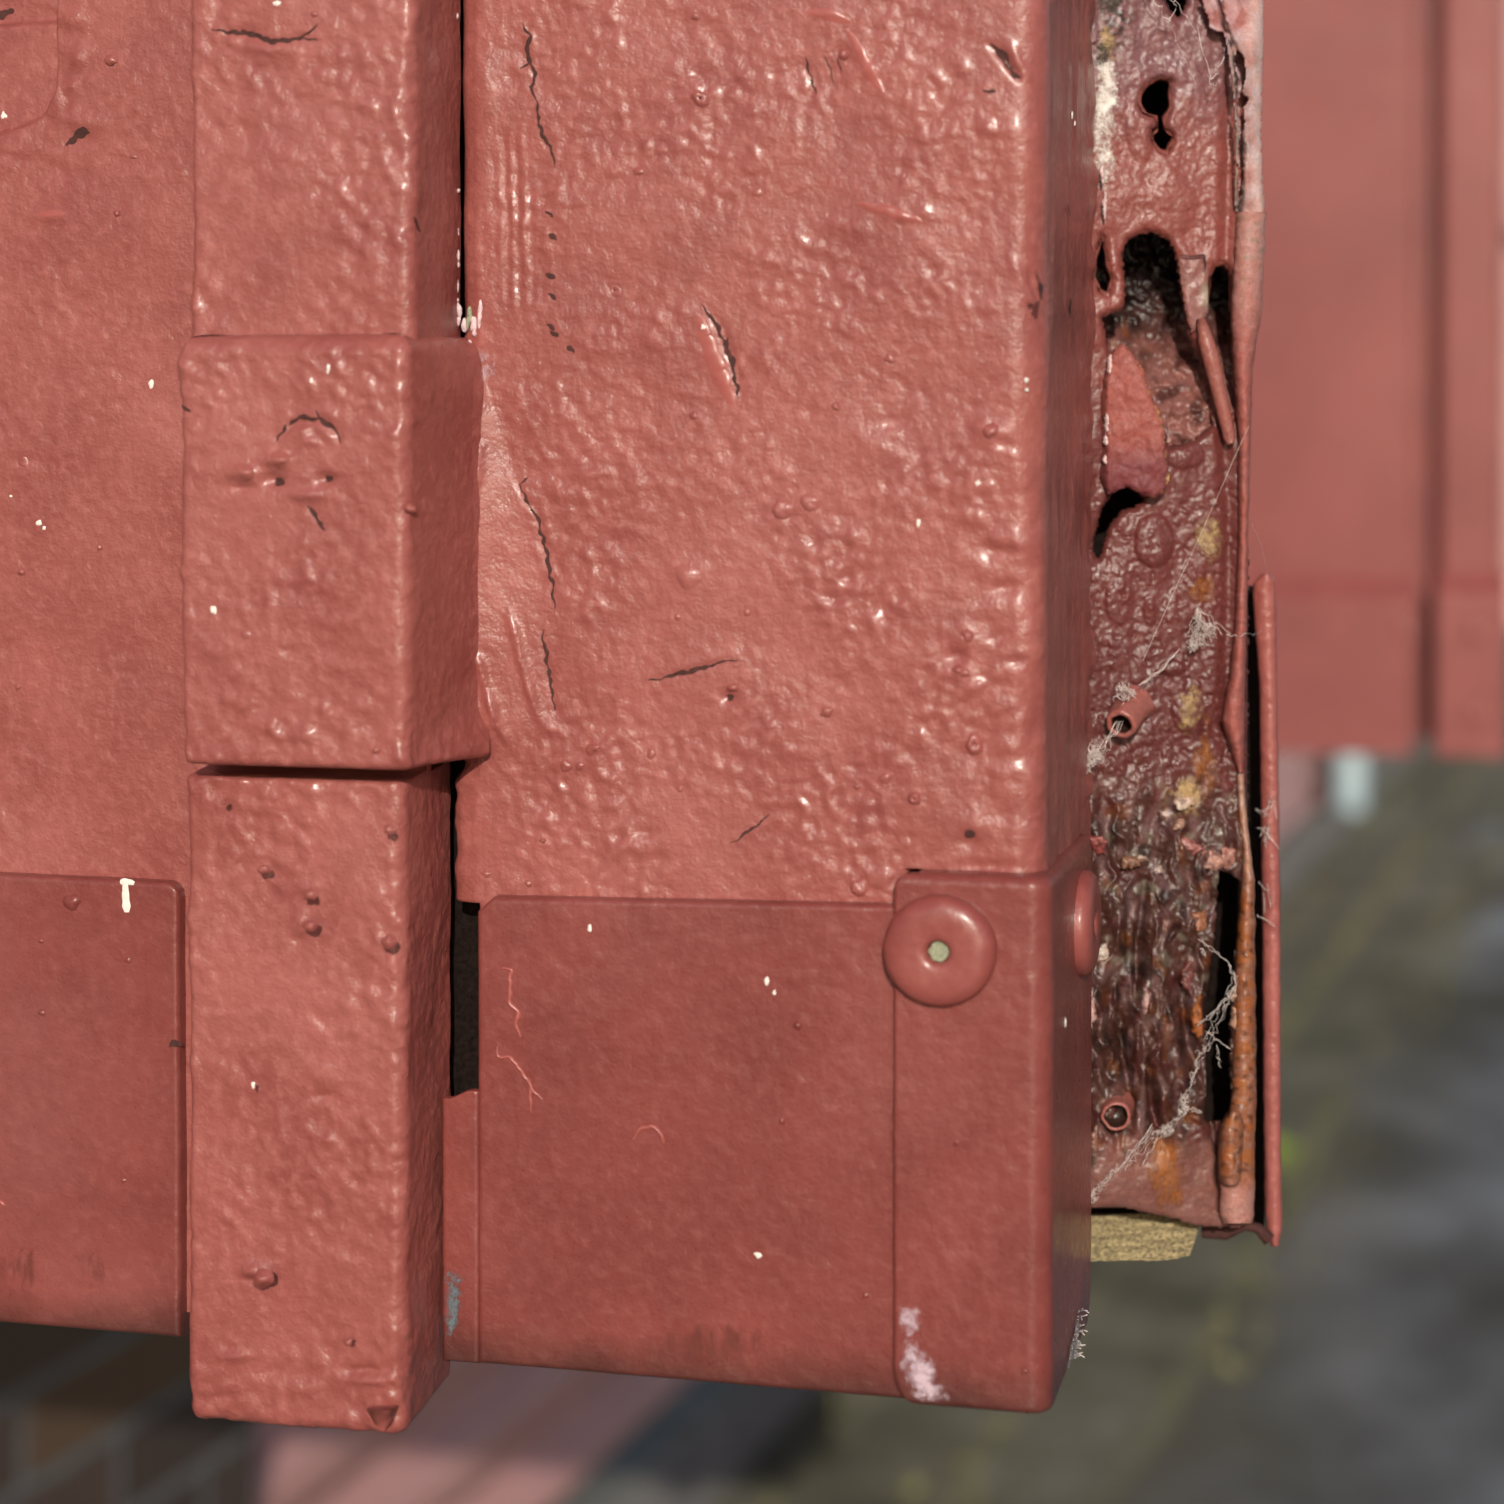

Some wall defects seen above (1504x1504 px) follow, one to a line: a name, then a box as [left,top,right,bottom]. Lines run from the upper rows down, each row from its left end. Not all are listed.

crack [211,24,317,45]
crack [520,23,555,167]
peeling [1202,0,1264,212]
crack [701,304,740,399]
corrosion [1096,233,1235,446]
crack [276,410,341,444]
crack [519,478,556,711]
corrosion [1161,740,1235,871]
corrosion [1098,943,1109,960]
corrosion [1141,987,1152,1015]
corrosion [1179,956,1203,1039]
corrosion [1218,1112,1245,1186]